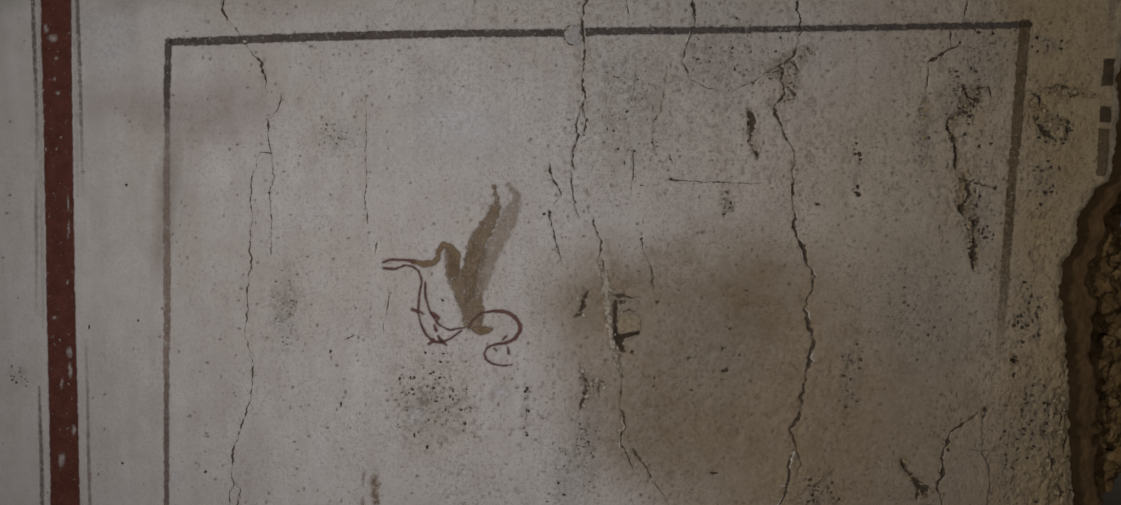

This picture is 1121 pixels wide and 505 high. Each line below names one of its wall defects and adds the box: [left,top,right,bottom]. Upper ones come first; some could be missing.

crack [221,0,284,505]
crack [543,0,605,271]
crack [631,0,817,505]
crack [920,0,969,165]
flaking render [997,67,1121,505]
crack [597,349,669,505]
crack [936,406,991,505]